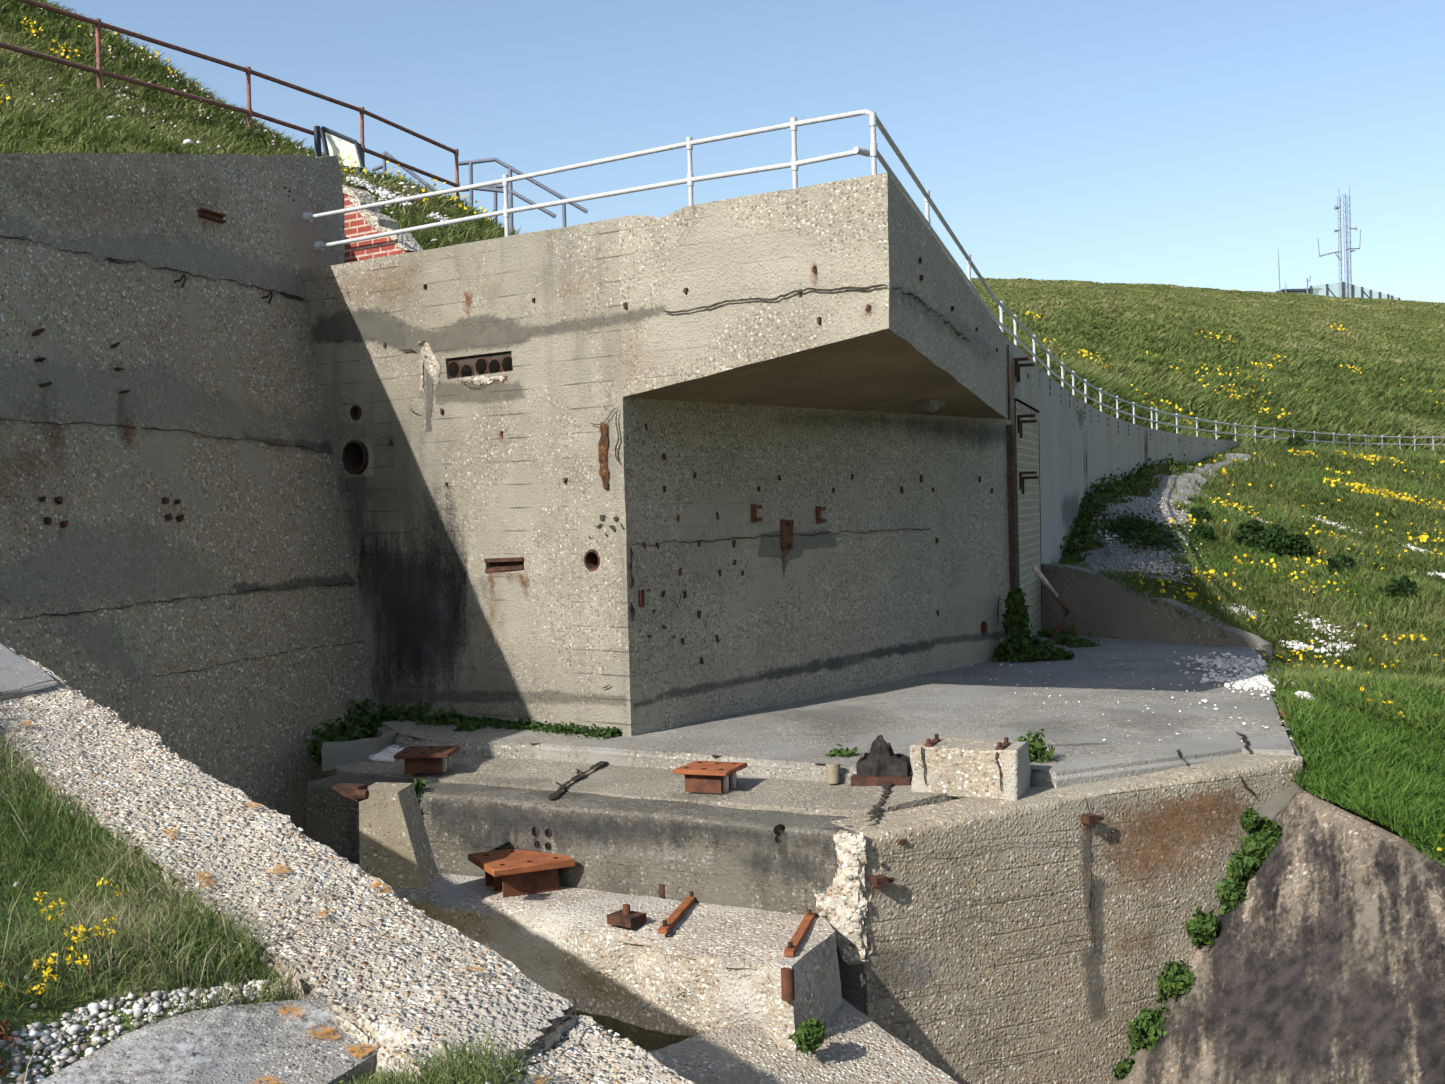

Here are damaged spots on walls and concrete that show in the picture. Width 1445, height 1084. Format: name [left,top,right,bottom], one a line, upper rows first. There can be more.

crack [0,235,304,301]
damp [312,307,665,352]
crack [663,284,970,342]
crack [0,419,333,454]
damp [425,369,433,431]
damp [234,540,462,687]
spalling [815,783,894,988]
corrosion [1106,790,1242,891]
damp [1221,805,1341,944]
damp [1368,840,1445,923]